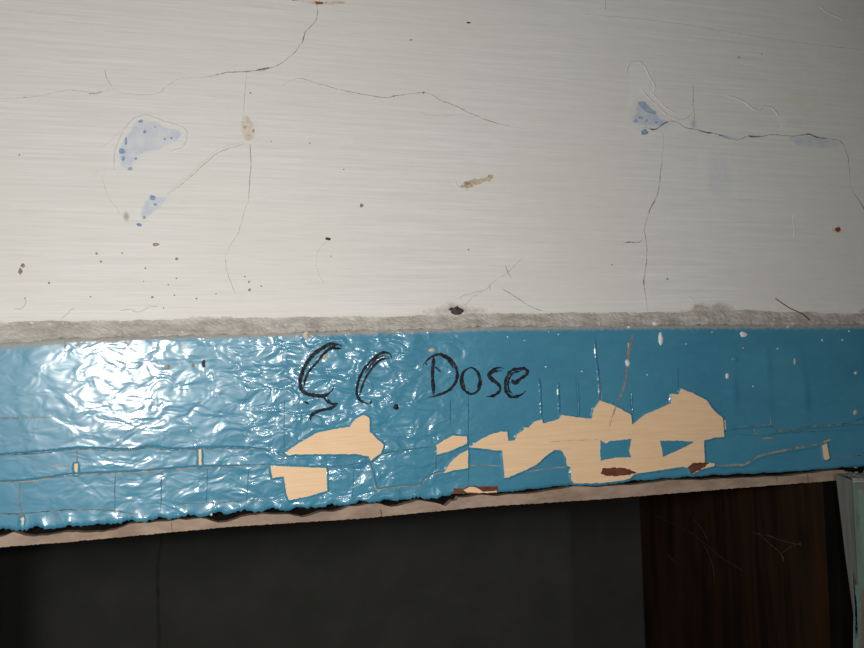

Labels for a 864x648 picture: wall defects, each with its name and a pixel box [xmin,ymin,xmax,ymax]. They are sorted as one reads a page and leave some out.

crack [210,5,517,128]
crack [643,89,864,209]
crack [625,153,663,311]
peeling [268,413,386,502]
peeling [434,387,726,494]